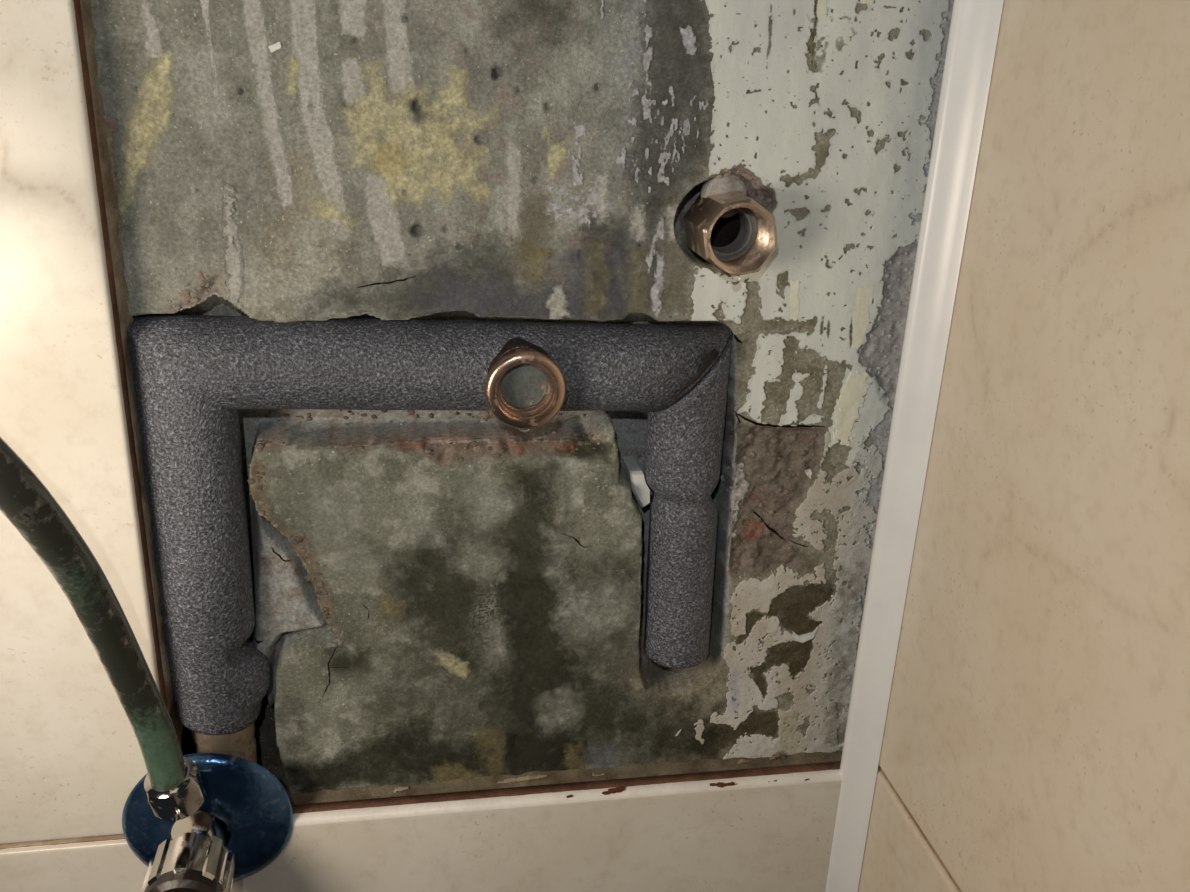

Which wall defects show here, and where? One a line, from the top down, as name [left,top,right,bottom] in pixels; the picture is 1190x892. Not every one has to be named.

spalling [247,439,339,644]
spalling [340,410,603,464]
damp [285,470,717,792]
crack [753,512,808,547]
peeling [691,0,949,759]